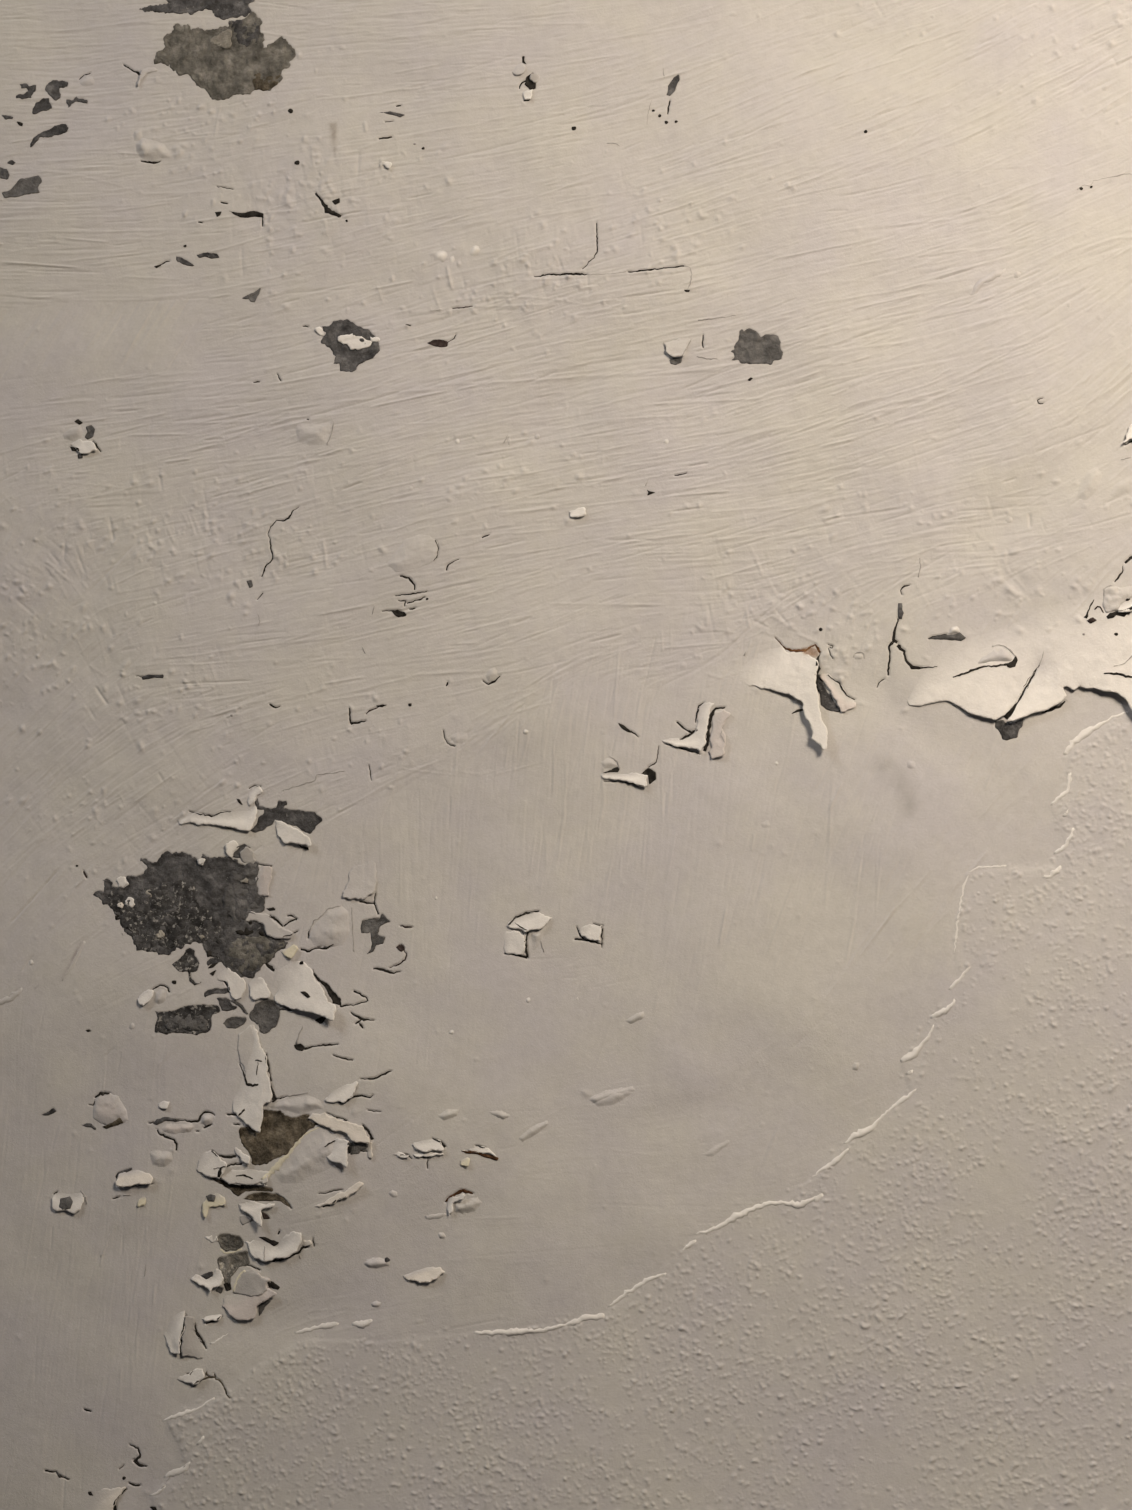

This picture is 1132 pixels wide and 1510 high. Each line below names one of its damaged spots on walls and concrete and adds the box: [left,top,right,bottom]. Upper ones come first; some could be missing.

spalling [140,0,296,101]
peeling [2,80,88,147]
peeling [0,160,42,198]
spalling [303,319,380,372]
peeling [739,628,856,750]
peeling [907,585,1132,740]
peeling [600,702,731,787]
spalling [93,785,391,1398]
peeling [460,1145,499,1167]
peeling [52,1191,87,1214]
peeling [425,1189,482,1220]
peeling [403,1267,445,1283]